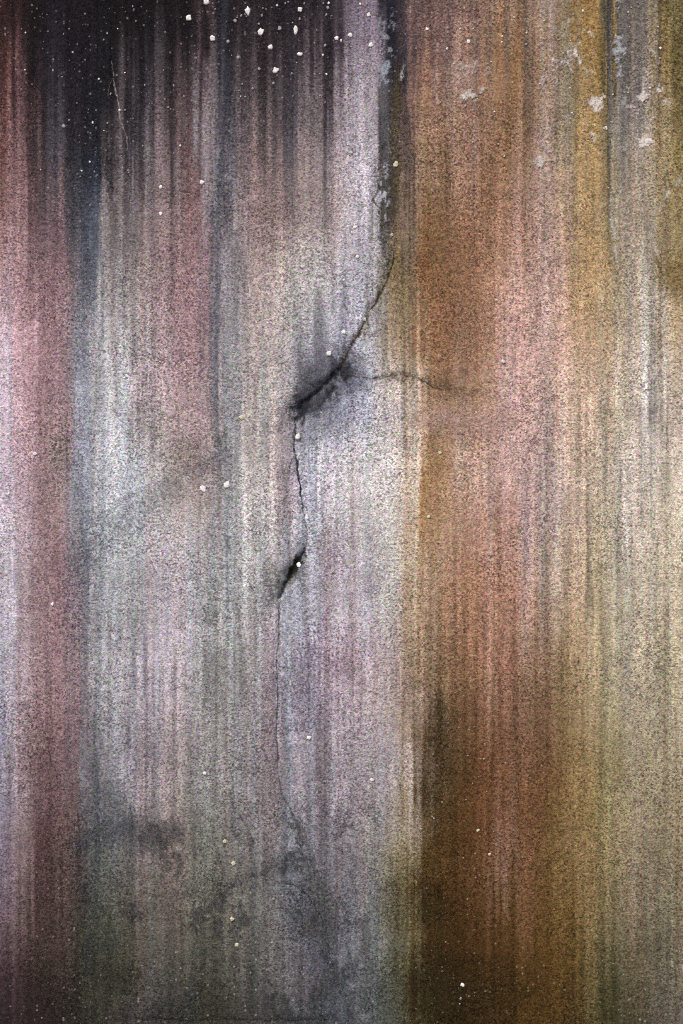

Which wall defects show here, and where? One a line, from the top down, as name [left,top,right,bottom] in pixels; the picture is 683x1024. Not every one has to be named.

leakage [0,0,332,719]
crack [276,158,447,847]
leakage [351,0,413,381]
corrosion [419,434,443,561]
corrosion [410,43,528,404]
corrosion [406,489,588,1024]